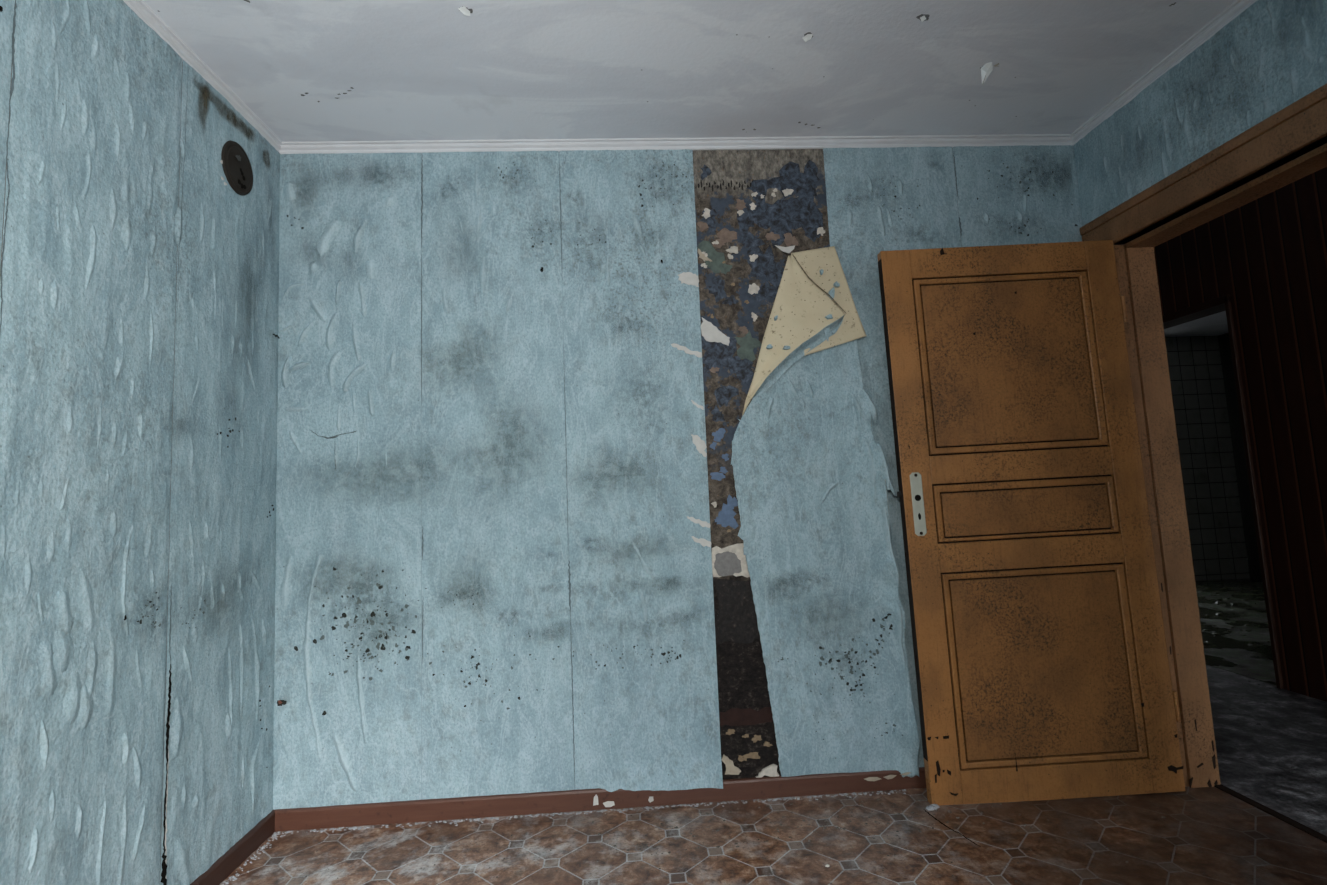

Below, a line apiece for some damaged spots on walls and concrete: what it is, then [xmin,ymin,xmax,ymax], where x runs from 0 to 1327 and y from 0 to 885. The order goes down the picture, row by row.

leakage [199,86,253,138]
flaking render [692,149,830,780]
mould [313,570,427,681]
mould [427,645,537,710]
mould [590,640,685,669]
mould [791,613,893,703]
crack [161,585,172,885]